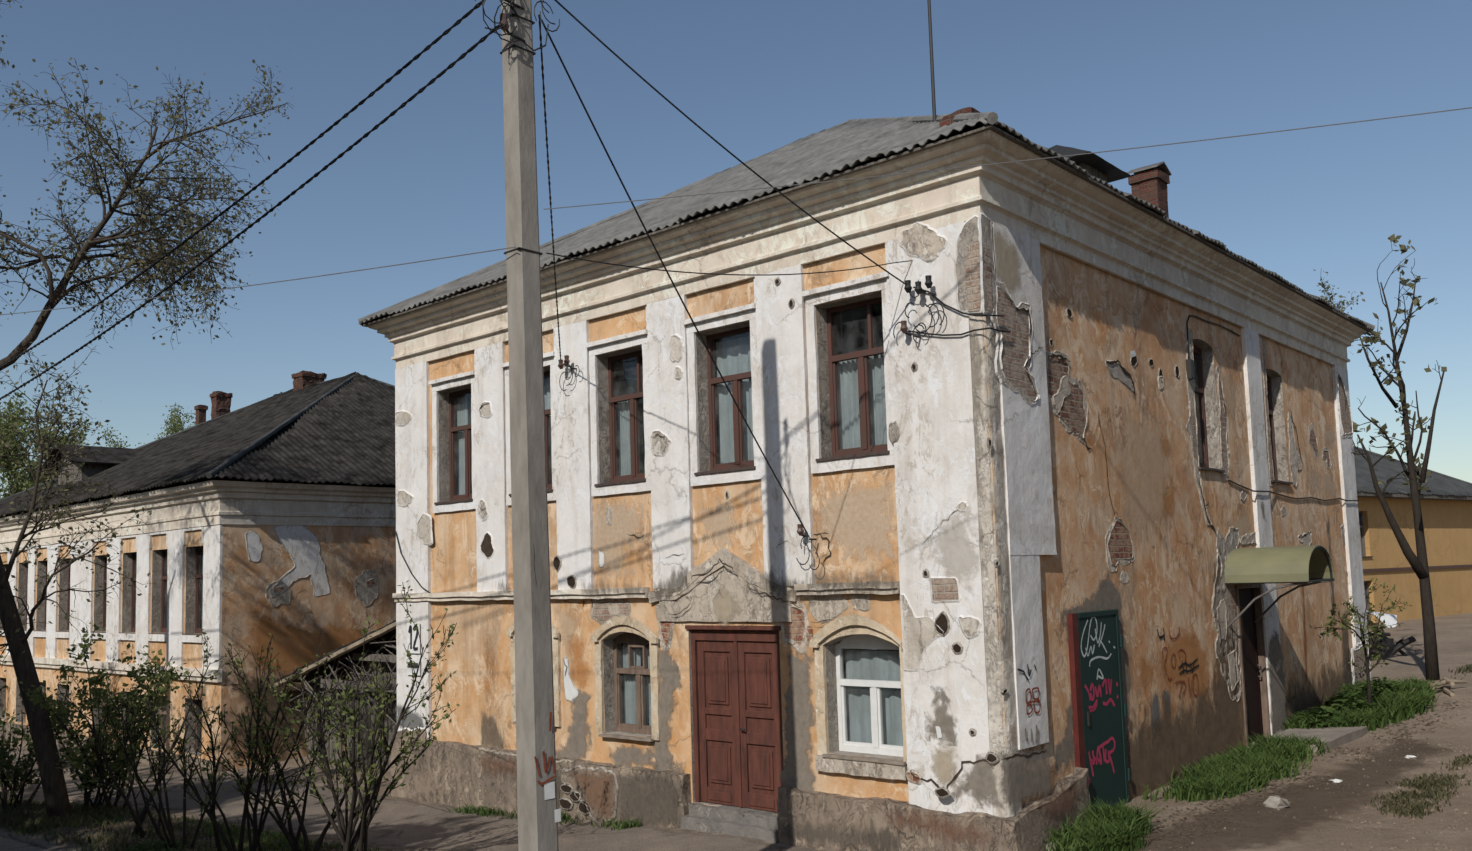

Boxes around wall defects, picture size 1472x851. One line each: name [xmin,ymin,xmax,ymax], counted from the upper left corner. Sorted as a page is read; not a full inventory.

flaking render [899,212,1088,445]
peeling [244,525,330,608]
crack [1084,414,1117,522]
spalling [1105,328,1257,702]
water stain [1126,607,1244,800]
water stain [774,822,896,851]